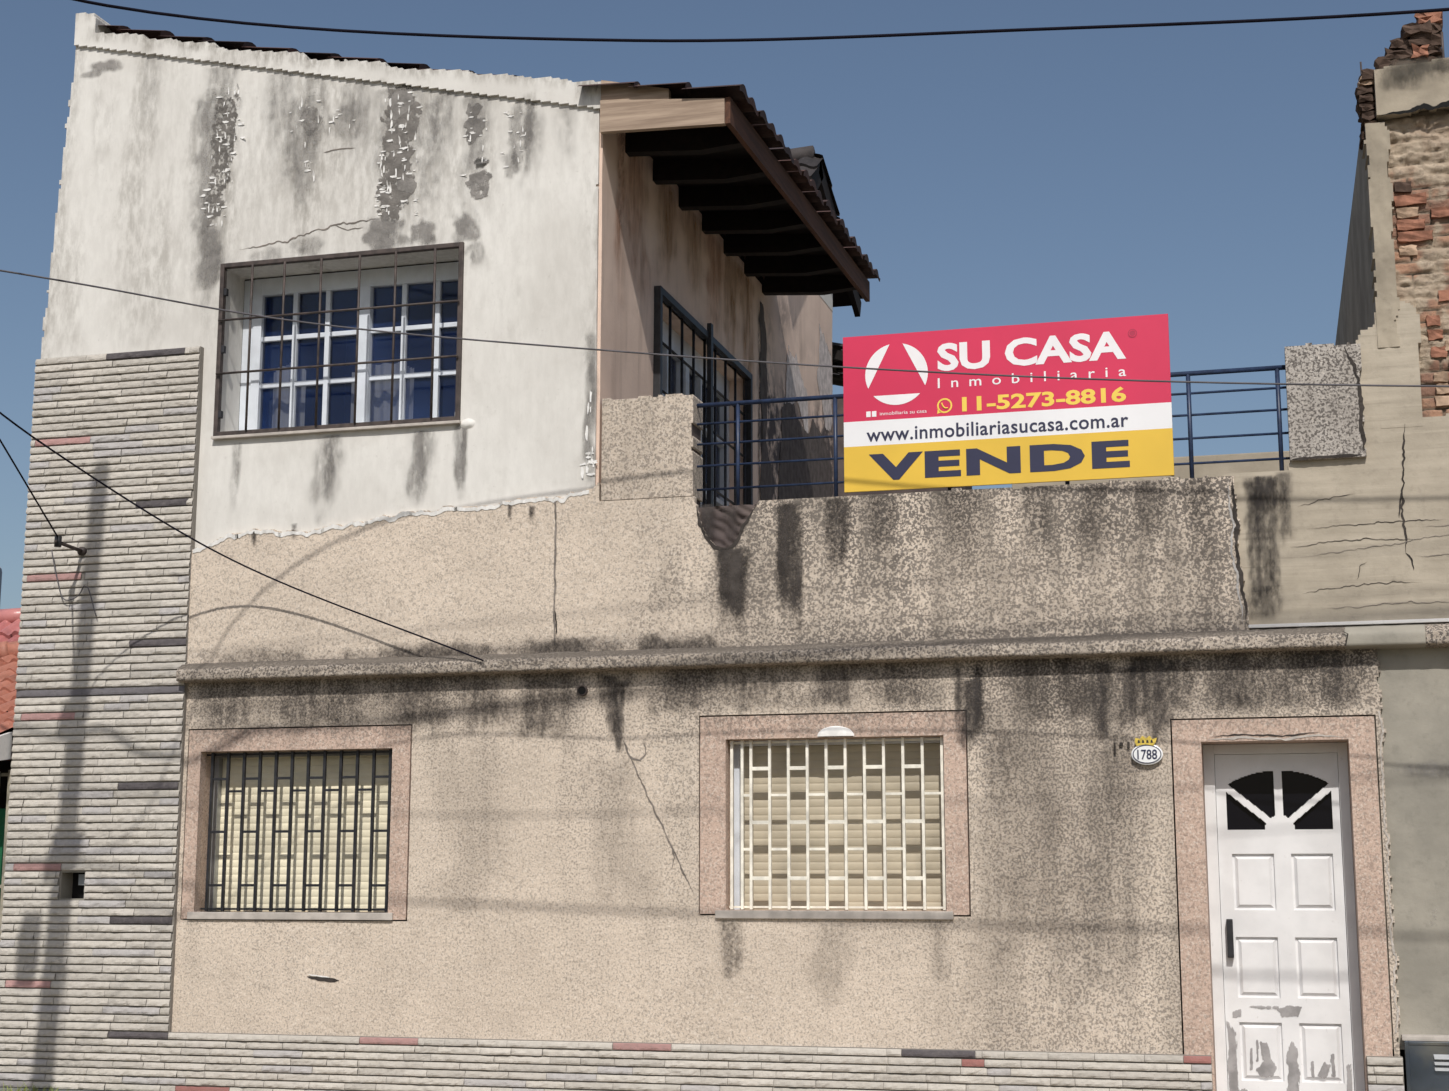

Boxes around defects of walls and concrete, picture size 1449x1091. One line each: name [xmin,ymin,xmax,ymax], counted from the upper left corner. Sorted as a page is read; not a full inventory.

peeling [196,84,245,284]
peeling [374,83,423,221]
crack [1384,100,1449,115]
spalling [1394,181,1449,256]
leakage [718,548,748,615]
leakage [777,504,802,608]
leakage [1245,474,1288,615]
crack [1298,427,1449,609]
leakage [603,676,646,761]
leakage [955,668,982,744]
crack [627,751,694,894]
peeling [1226,1005,1352,1091]